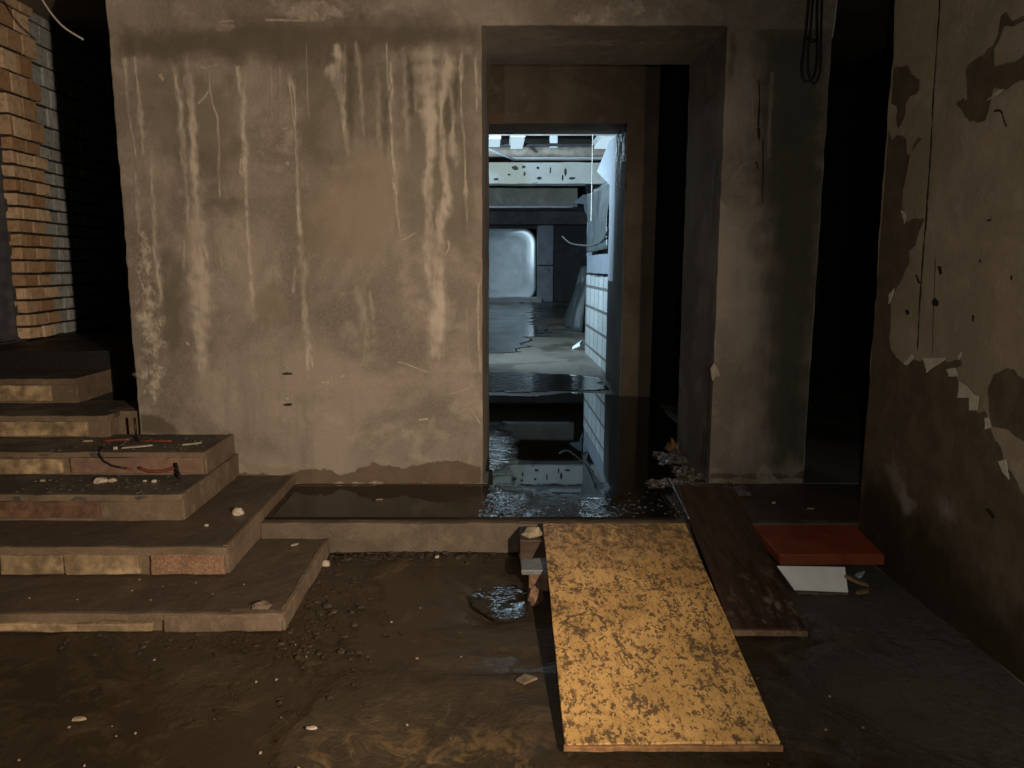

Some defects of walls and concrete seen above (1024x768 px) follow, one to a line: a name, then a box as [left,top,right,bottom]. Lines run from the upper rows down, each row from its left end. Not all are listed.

water stain [122,24,477,432]
water stain [287,461,481,484]
peeling [859,65,1024,665]
peeling [957,12,1024,123]